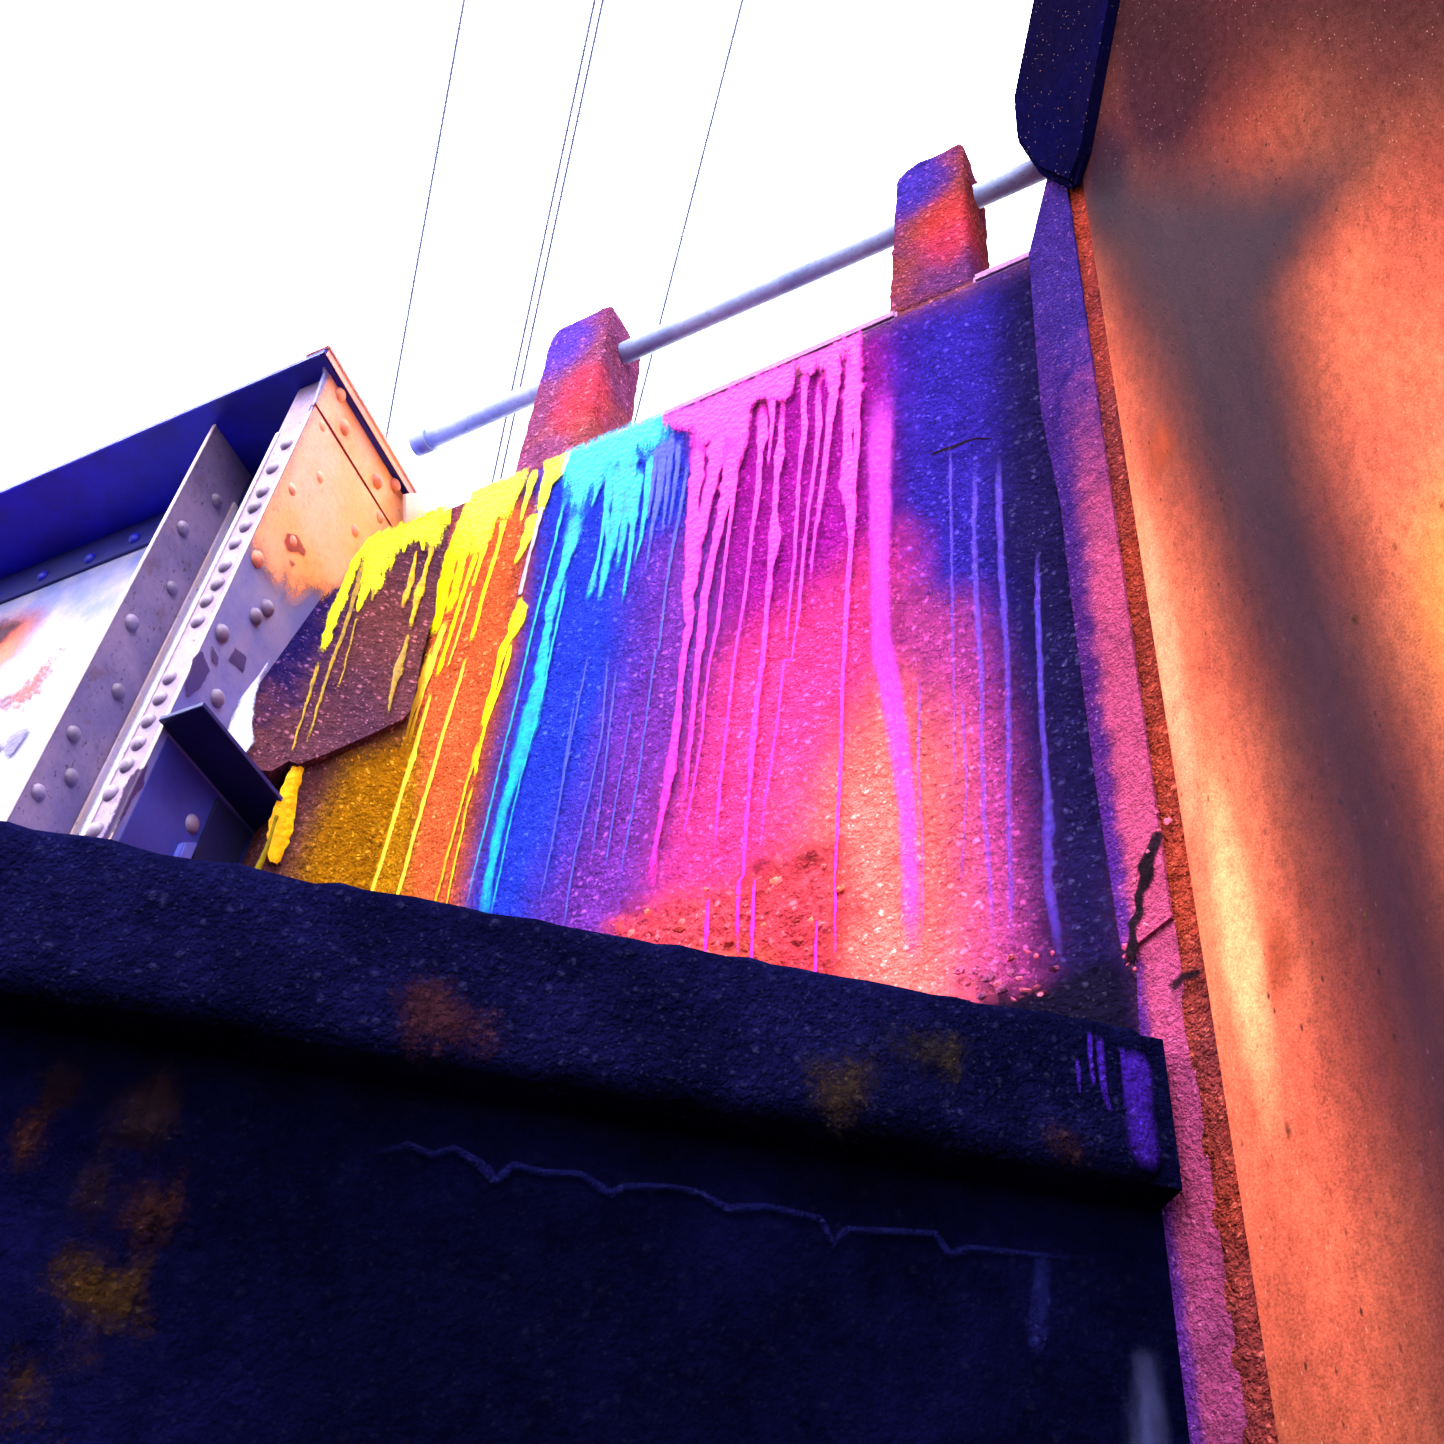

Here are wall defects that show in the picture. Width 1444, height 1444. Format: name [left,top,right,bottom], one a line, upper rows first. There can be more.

rust [285,533,306,566]
rust [0,617,35,666]
rust [0,647,64,714]
crack [1122,810,1172,971]